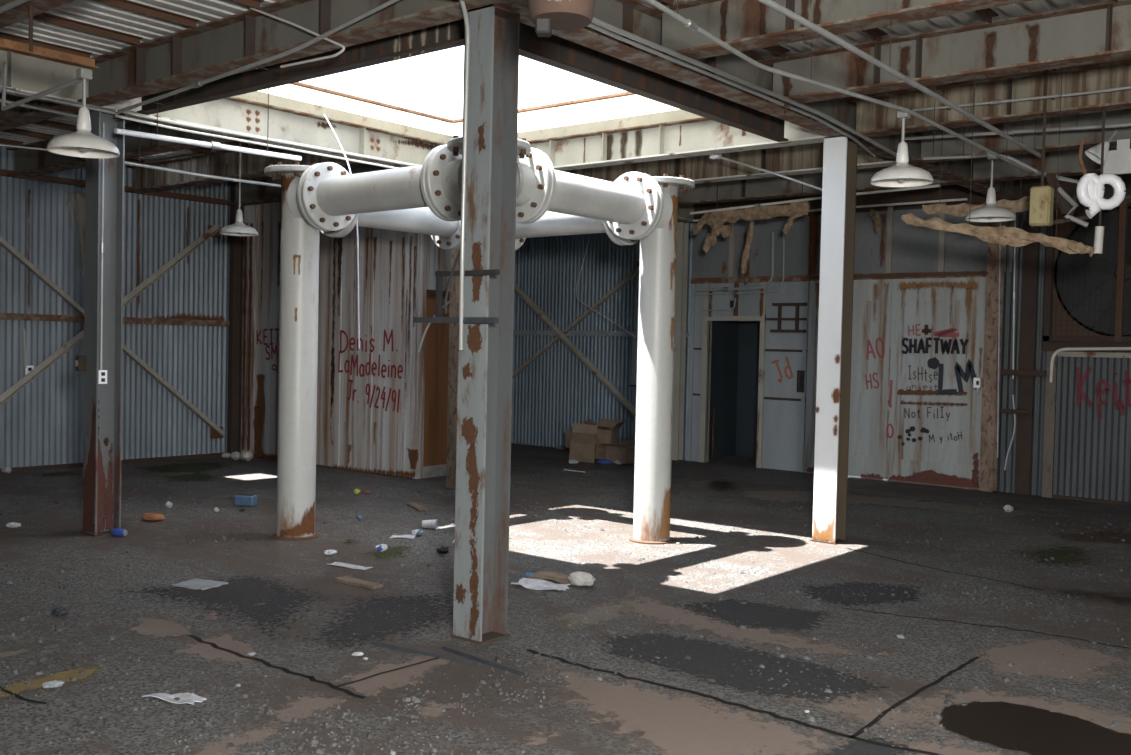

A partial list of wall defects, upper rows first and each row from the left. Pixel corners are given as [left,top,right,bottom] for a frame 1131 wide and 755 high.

corrosion [281,503,315,537]
corrosion [657,489,671,540]
crack [843,608,1129,648]
crack [187,635,439,699]
crack [527,649,980,755]
leakage [939,701,1131,755]